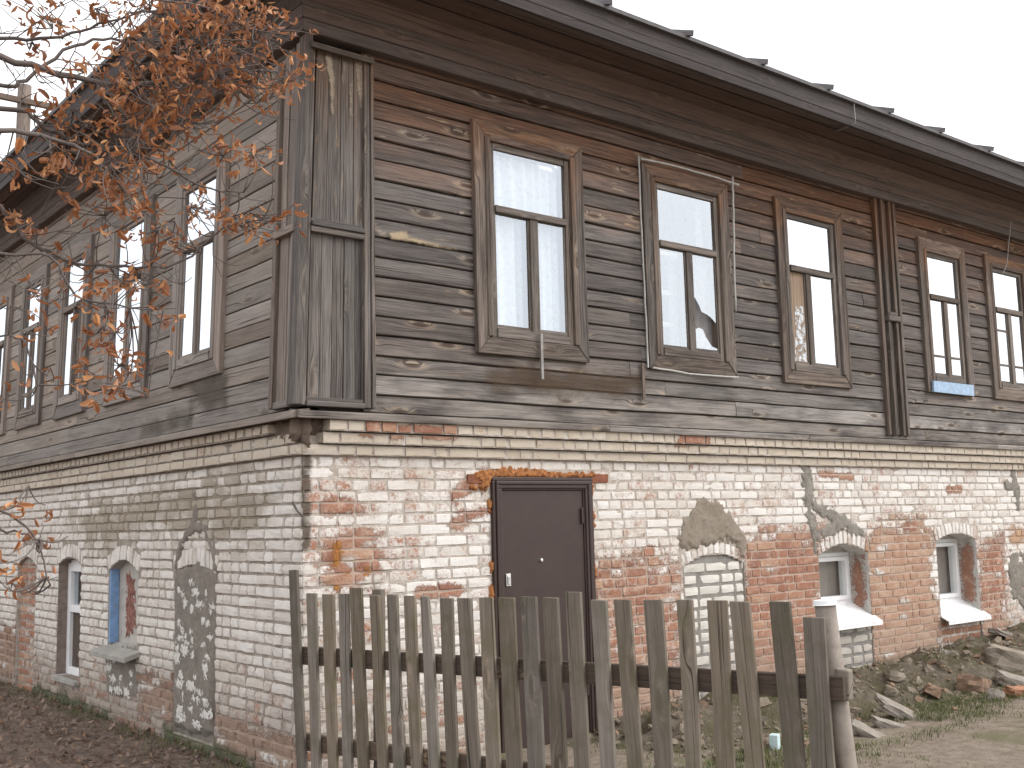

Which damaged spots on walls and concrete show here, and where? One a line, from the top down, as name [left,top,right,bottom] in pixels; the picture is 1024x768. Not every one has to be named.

crack [174,488,219,574]
peeling [313,494,385,594]
peeling [415,581,464,600]
peeling [446,477,489,532]
peeling [595,533,684,667]
peeling [735,510,831,674]
crack [798,465,865,554]
peeling [849,511,943,663]
peeling [0,624,16,685]
peeling [106,572,297,768]
peeling [613,686,623,718]
peeling [638,688,651,715]